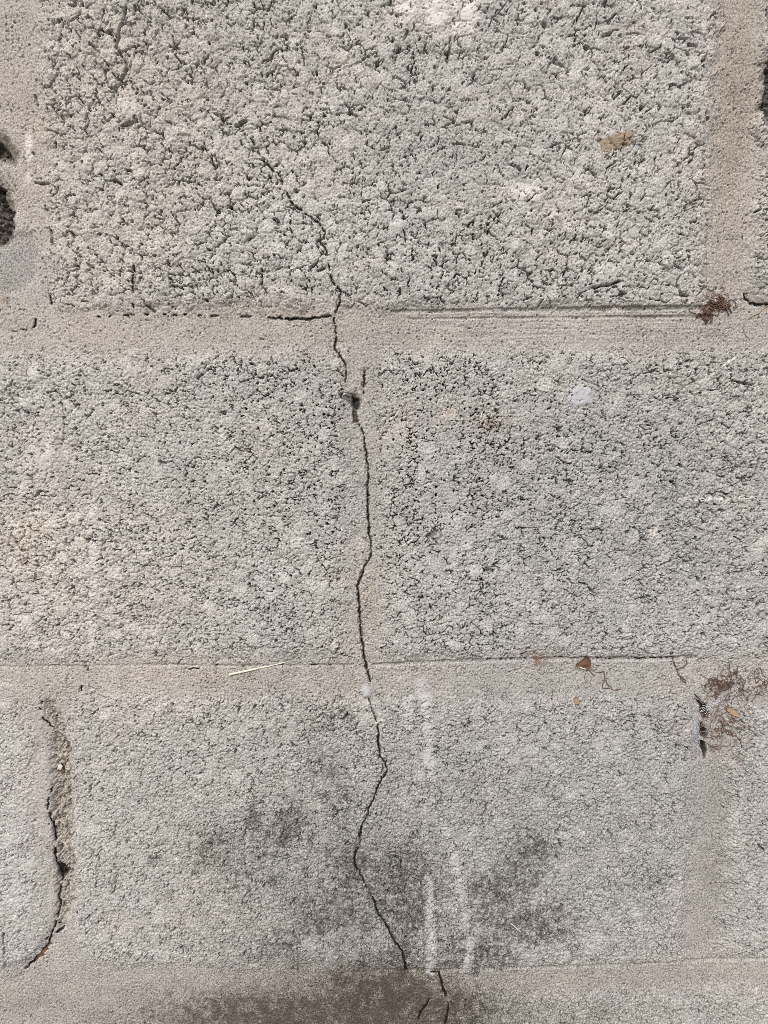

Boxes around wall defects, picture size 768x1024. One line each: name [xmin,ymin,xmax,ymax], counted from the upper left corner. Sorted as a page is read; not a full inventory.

crack [98,138,365,396]
crack [353,428,452,1024]
crack [27,787,78,968]